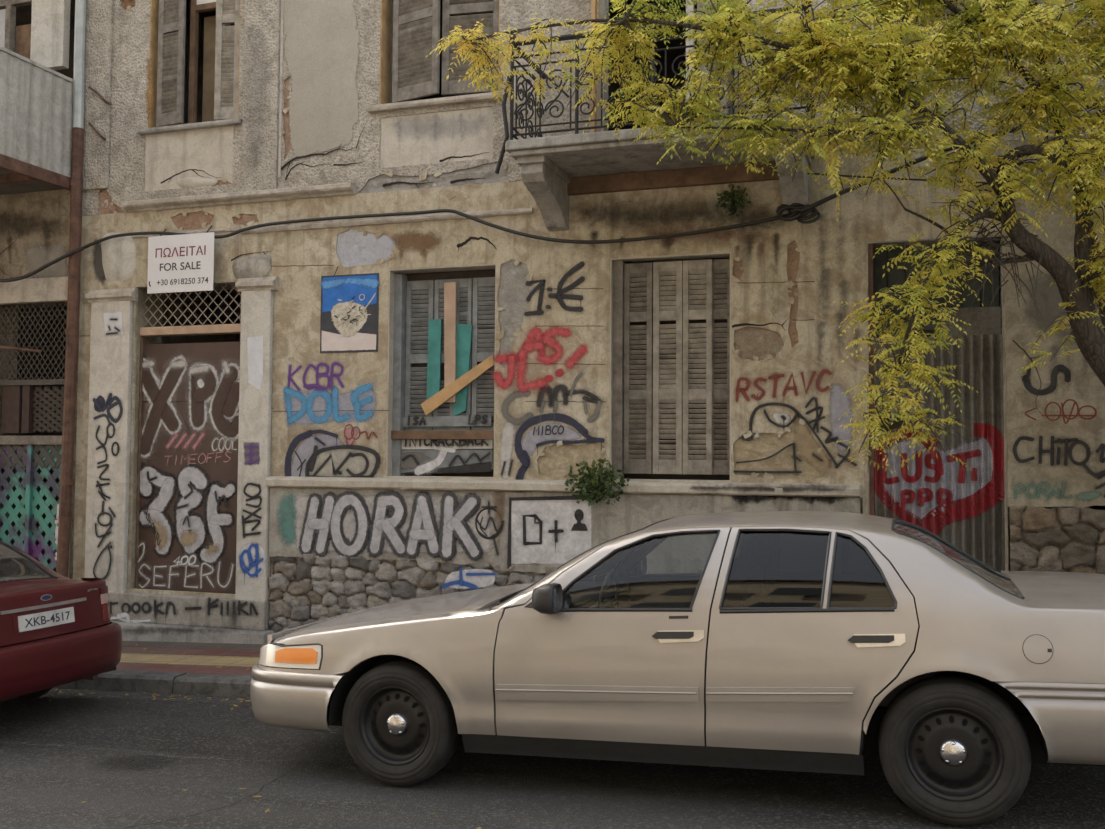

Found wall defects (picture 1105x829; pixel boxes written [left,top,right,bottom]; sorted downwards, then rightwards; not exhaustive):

spalling [281,78,292,158]
crack [281,122,367,180]
crack [382,152,489,188]
spalling [172,210,215,230]
spalling [233,214,259,227]
peeling [496,259,533,369]
spalling [733,240,801,362]